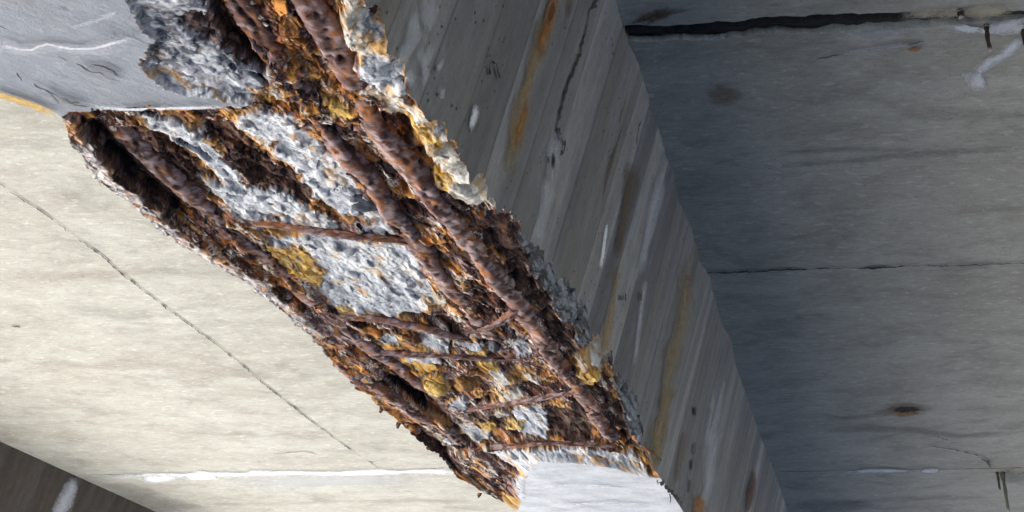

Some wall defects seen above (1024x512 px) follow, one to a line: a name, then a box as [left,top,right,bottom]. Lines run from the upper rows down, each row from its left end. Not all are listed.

rust [508,0,557,158]
crack [554,0,598,154]
rust [633,8,684,24]
efflorescence [914,6,1024,90]
crack [1,184,393,478]
spalling [58,0,660,511]
rust [616,170,636,250]